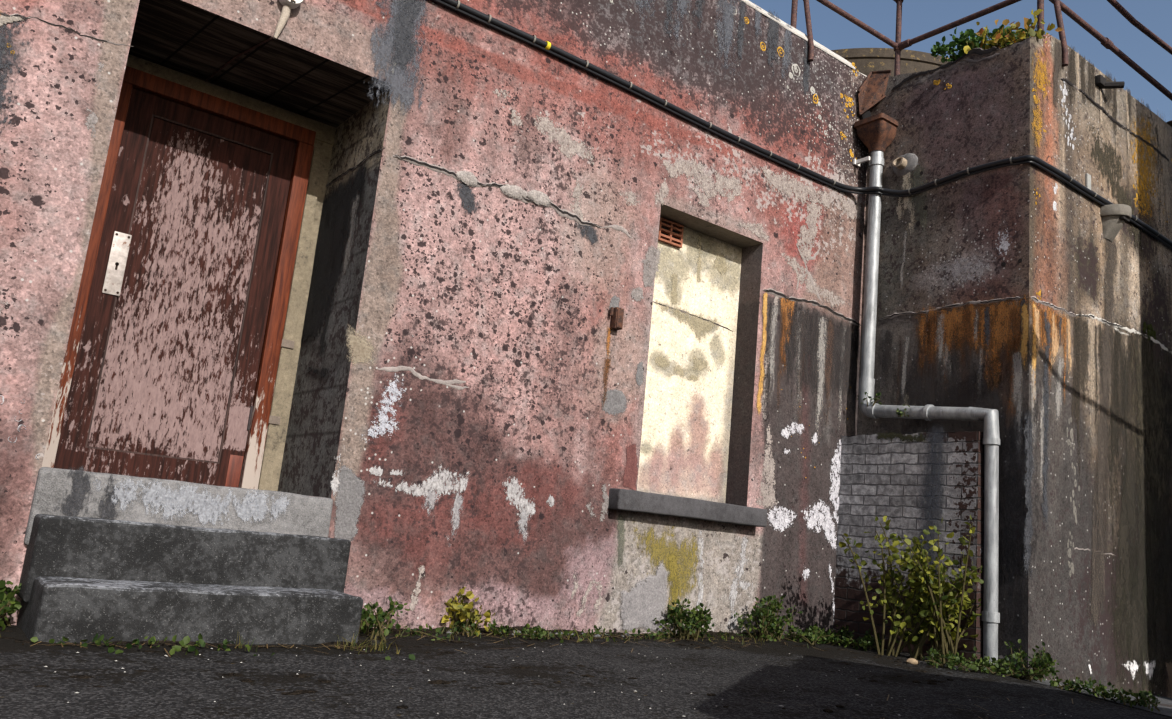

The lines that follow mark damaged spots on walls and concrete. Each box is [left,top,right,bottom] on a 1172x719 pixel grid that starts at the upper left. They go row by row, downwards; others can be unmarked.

damp [0,10,32,133]
crack [11,14,129,46]
damp [369,0,427,109]
crack [326,147,633,239]
damp [1053,41,1172,254]
crack [763,243,1172,352]
damp [939,228,1010,284]
corrosion [916,295,1072,416]
peeling [331,454,469,541]
peeling [504,476,554,538]
damp [756,303,861,548]
damp [874,239,1172,695]